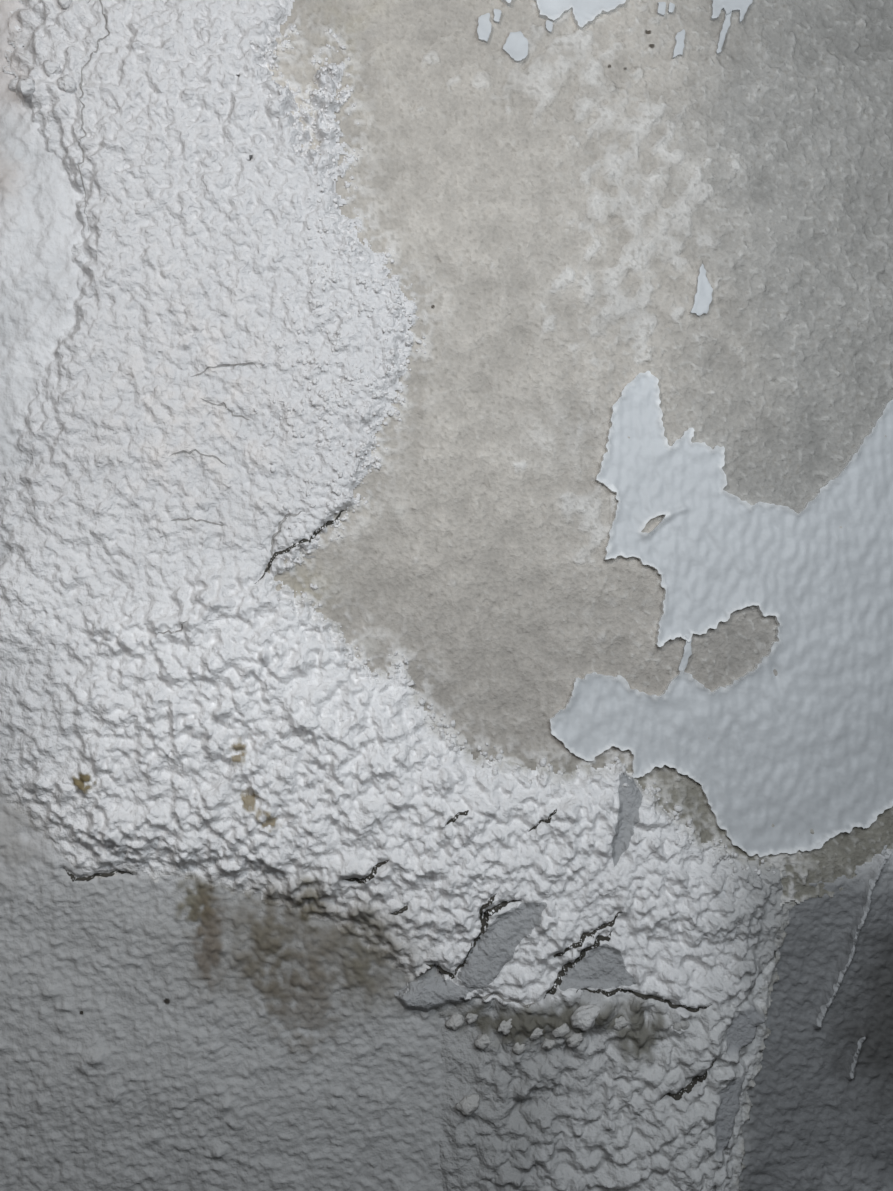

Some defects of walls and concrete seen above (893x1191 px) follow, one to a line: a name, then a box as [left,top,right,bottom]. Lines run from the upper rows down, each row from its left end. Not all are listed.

crack [255,509,347,584]
flaking render [267,0,893,1031]
flaking render [0,550,796,1017]
flaking render [474,1004,600,1055]
peeling [849,1037,866,1079]